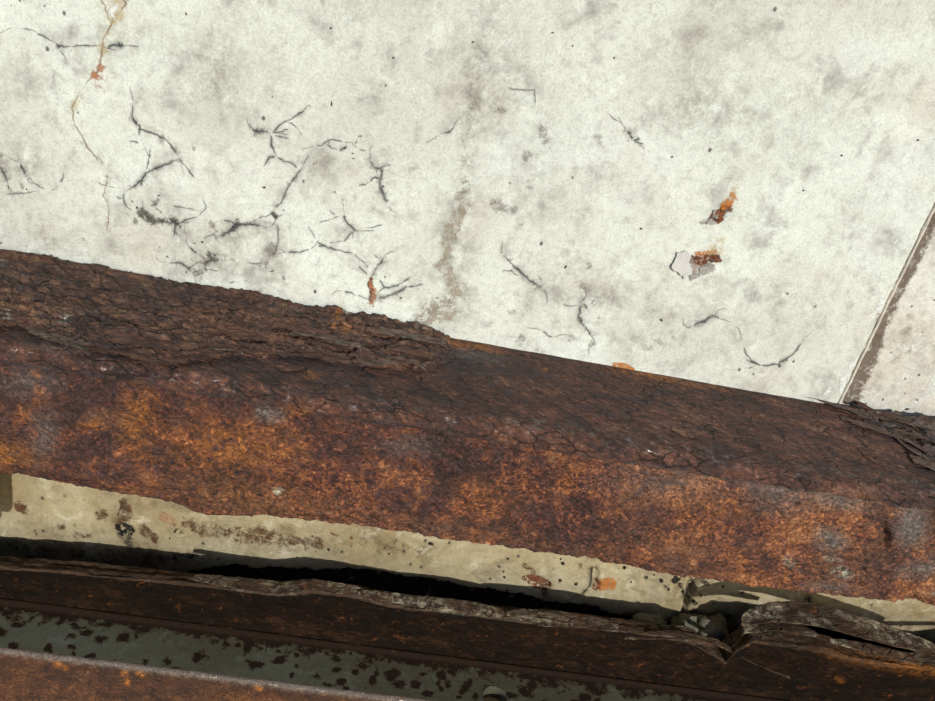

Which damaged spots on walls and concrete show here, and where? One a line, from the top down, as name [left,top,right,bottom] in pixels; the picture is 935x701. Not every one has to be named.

crack [0,0,422,304]
spalling [700,192,736,225]
spalling [671,249,722,281]
corrosion [117,500,132,524]
corrosion [140,524,158,543]
corrosion [159,513,323,549]
corrosion [522,563,552,595]
corrosion [592,578,617,590]
spalling [644,574,710,605]